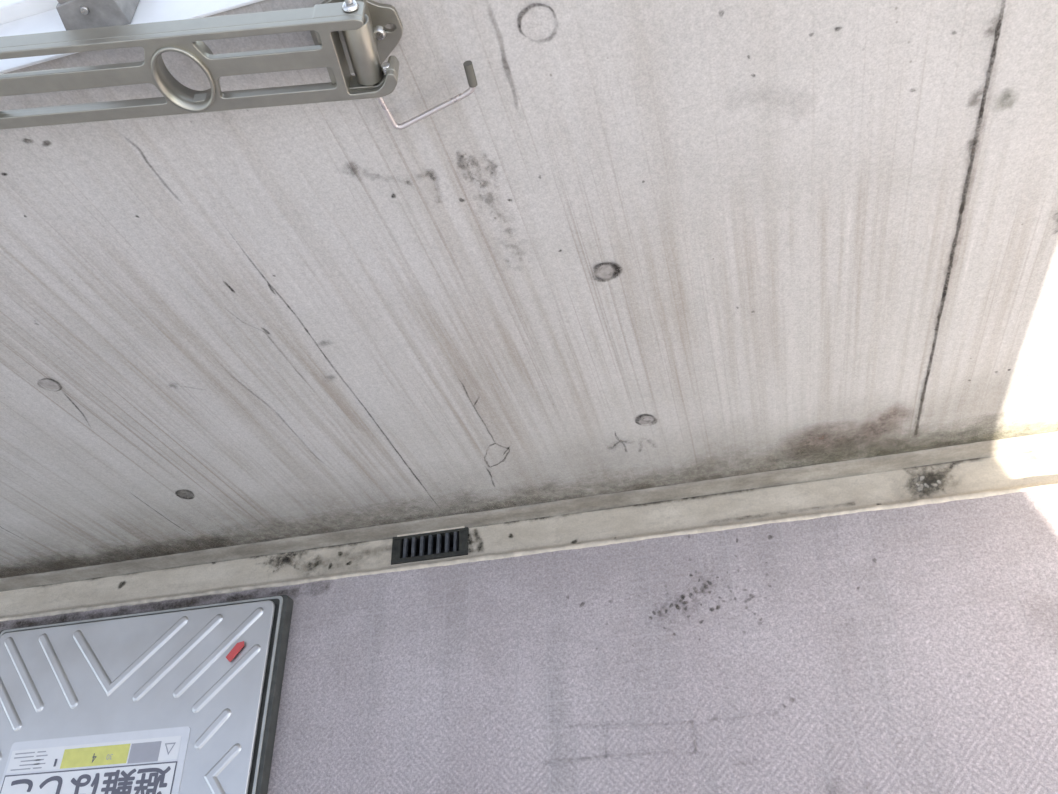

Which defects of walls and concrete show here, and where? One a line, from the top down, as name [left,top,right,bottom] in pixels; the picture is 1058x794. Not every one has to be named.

crack [915,12,1003,435]